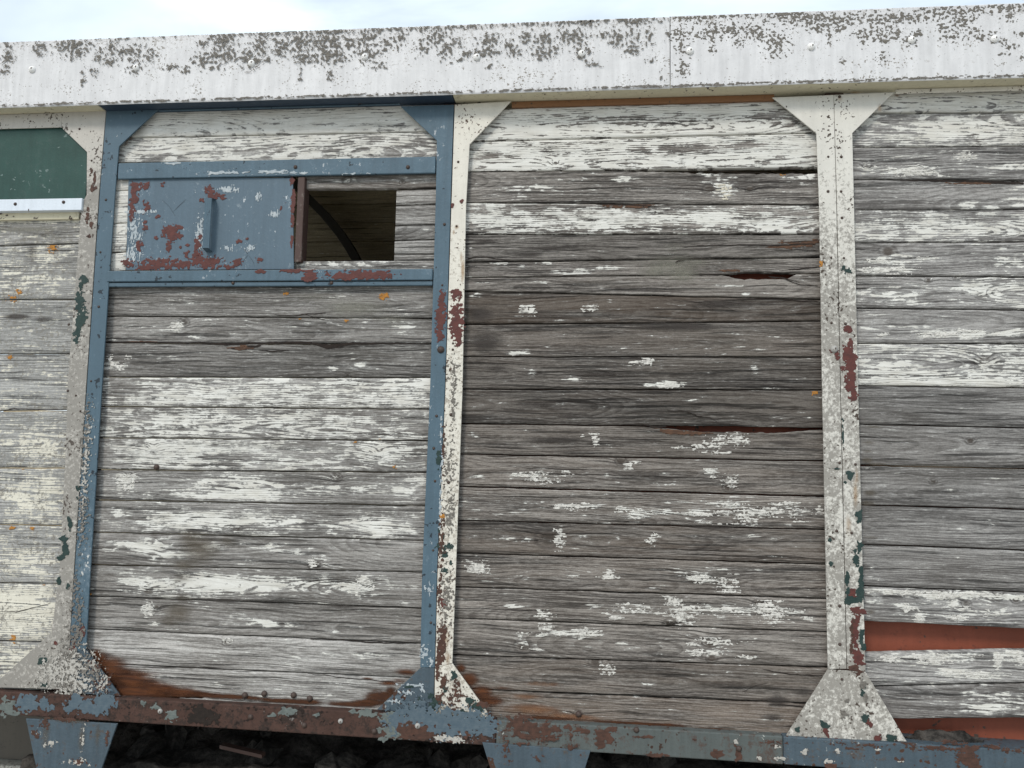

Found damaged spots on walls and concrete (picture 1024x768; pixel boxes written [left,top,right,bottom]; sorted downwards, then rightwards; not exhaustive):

peeling [120,169,314,274]
crack [676,239,819,302]
peeling [829,325,859,402]
crack [623,408,818,436]
peeling [671,432,750,488]
peeling [348,289,618,762]
peeling [0,394,118,766]
rust [90,651,414,707]
rust [457,665,505,706]
rust [521,696,684,727]
peeling [516,596,813,659]
peeling [820,540,1024,768]